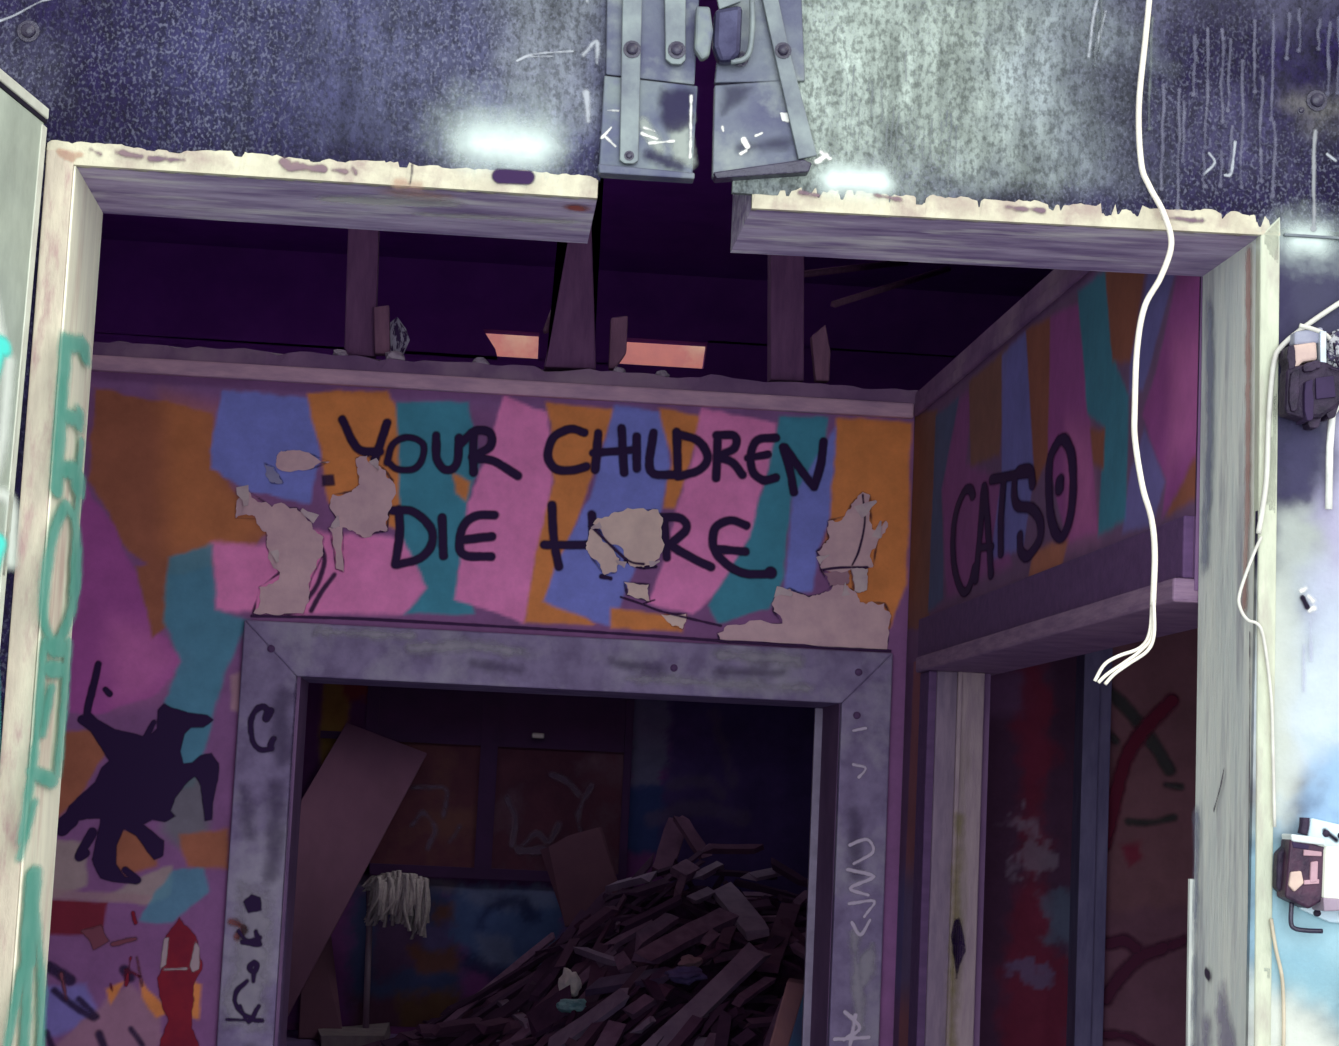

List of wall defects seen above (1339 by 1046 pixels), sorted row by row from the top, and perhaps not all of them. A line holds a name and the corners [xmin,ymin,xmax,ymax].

peeling [95,150,181,162]
peeling [279,158,357,175]
damp [1148,17,1185,152]
damp [1203,29,1276,198]
peeling [265,450,329,484]
peeling [236,456,396,615]
peeling [586,508,664,601]
peeling [717,492,891,649]
peeling [661,613,686,629]